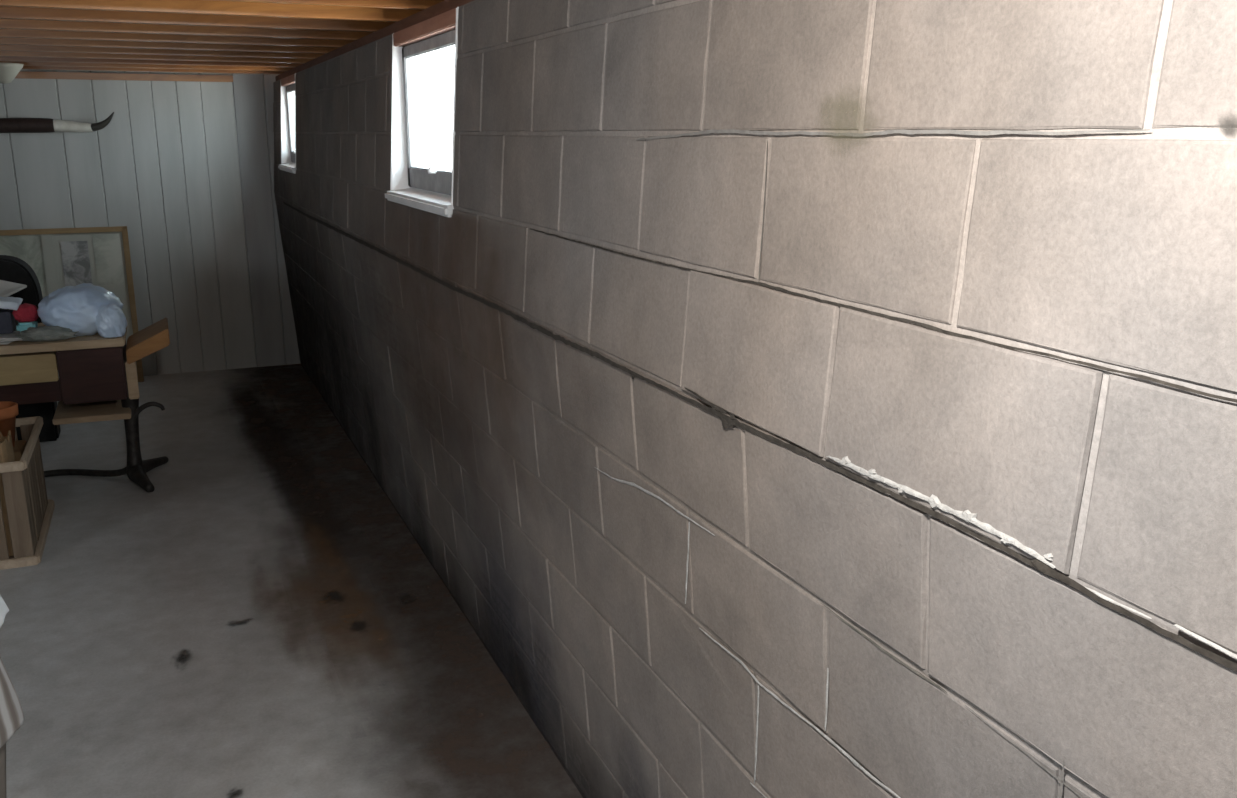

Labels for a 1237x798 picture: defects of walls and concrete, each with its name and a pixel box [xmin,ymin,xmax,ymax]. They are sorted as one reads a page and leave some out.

leakage [234,206,595,798]
crack [594,467,901,798]
crack [283,201,1237,672]
crack [531,129,1237,403]